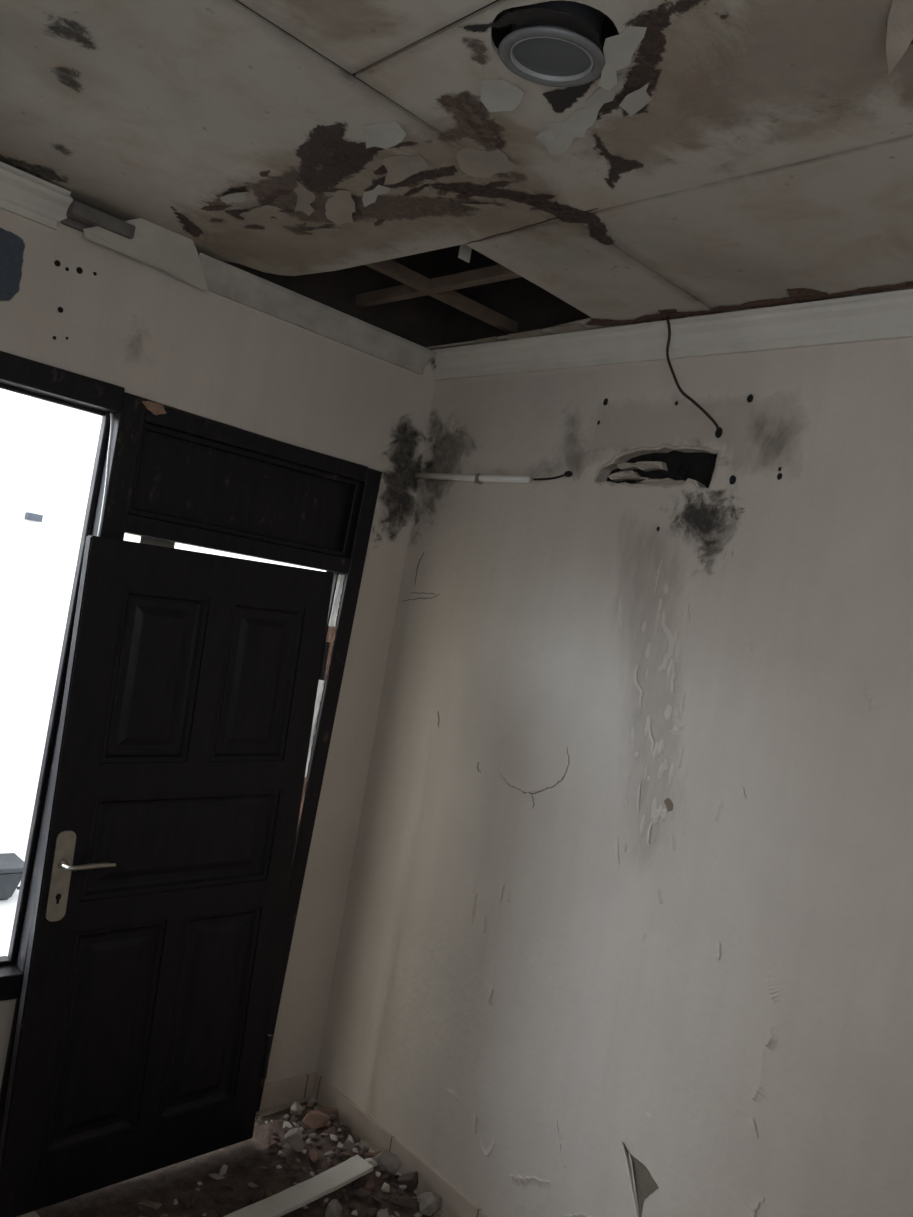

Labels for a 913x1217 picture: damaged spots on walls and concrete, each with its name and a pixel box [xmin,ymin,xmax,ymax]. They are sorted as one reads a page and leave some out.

peeling [480,79,524,112]
peeling [220,120,430,225]
peeling [456,148,519,179]
peeling [0,228,25,301]
mould [381,421,463,540]
hole [594,443,722,490]
mould [677,491,737,547]
crack [477,749,569,806]
peeling [620,1141,659,1217]